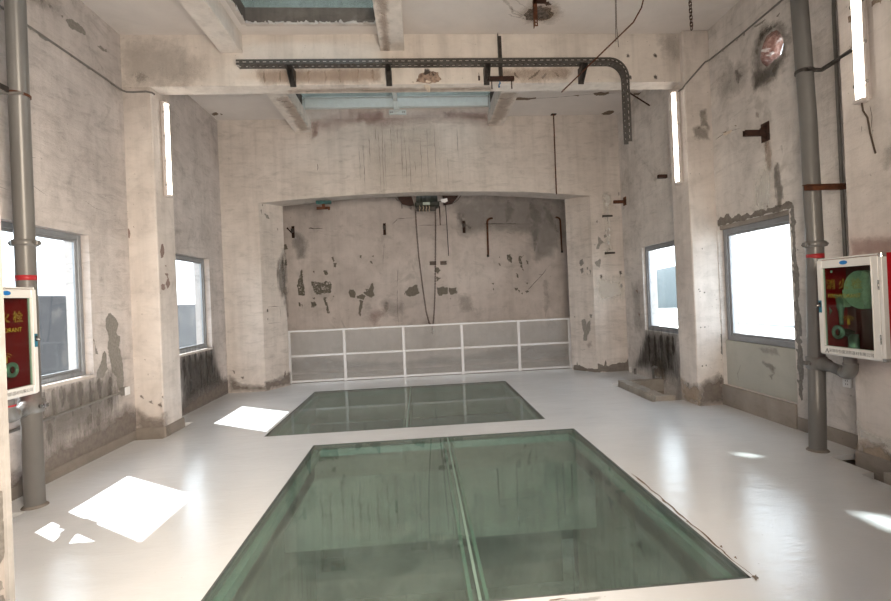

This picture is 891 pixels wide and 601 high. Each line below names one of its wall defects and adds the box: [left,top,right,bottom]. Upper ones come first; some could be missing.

spalling [524,1,554,21]
leakage [755,24,785,88]
peeling [297,257,337,313]
peeling [349,283,374,316]
peeling [404,285,419,297]
peeling [435,267,458,299]
leakage [181,349,398,416]
leakage [409,345,569,365]
leakage [573,331,723,405]